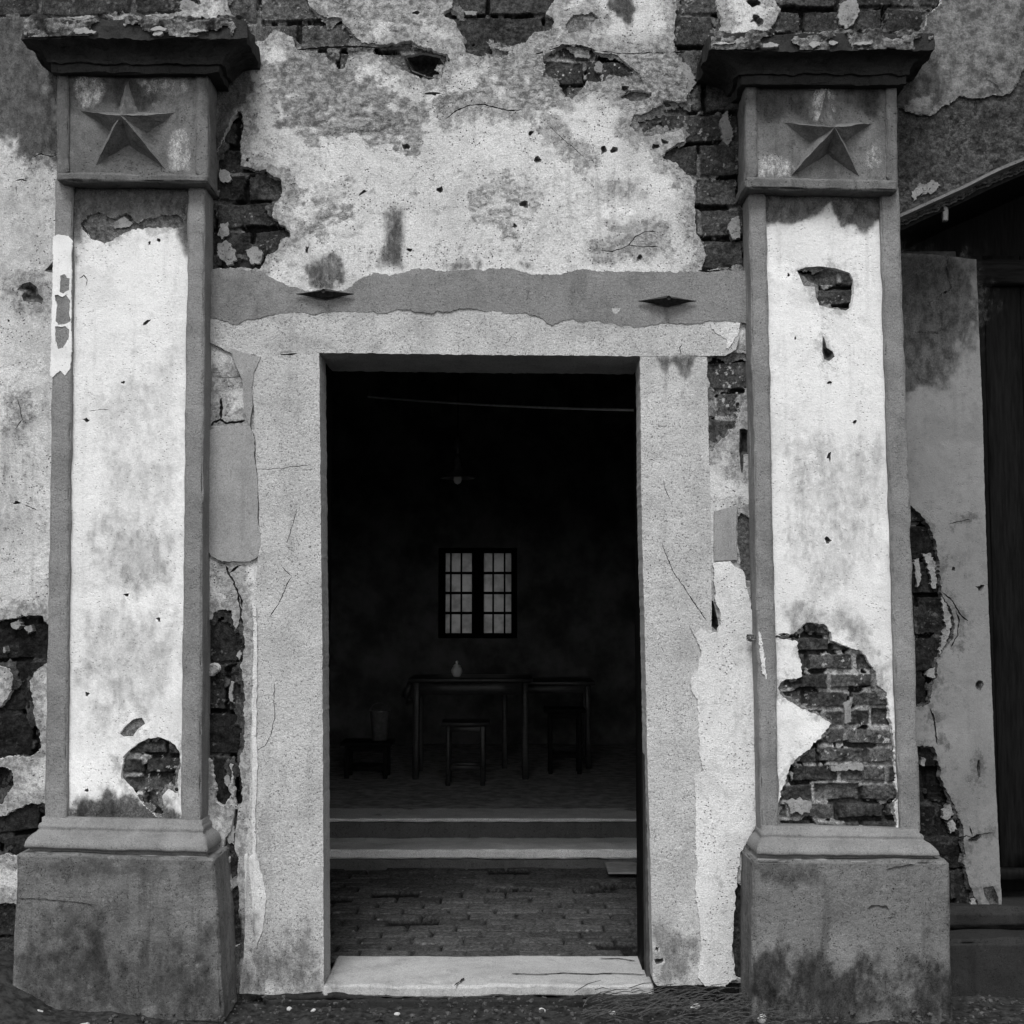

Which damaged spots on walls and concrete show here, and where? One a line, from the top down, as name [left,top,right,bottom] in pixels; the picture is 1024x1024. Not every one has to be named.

peeling [0,0,450,79]
peeling [213,108,291,269]
crack [447,104,522,118]
peeling [442,0,942,271]
spalling [787,266,854,311]
crack [226,565,243,620]
crack [663,548,707,621]
peeling [910,506,955,707]
peeling [0,615,48,856]
peeling [120,718,181,817]
peeling [209,609,245,946]
peeling [776,622,898,827]